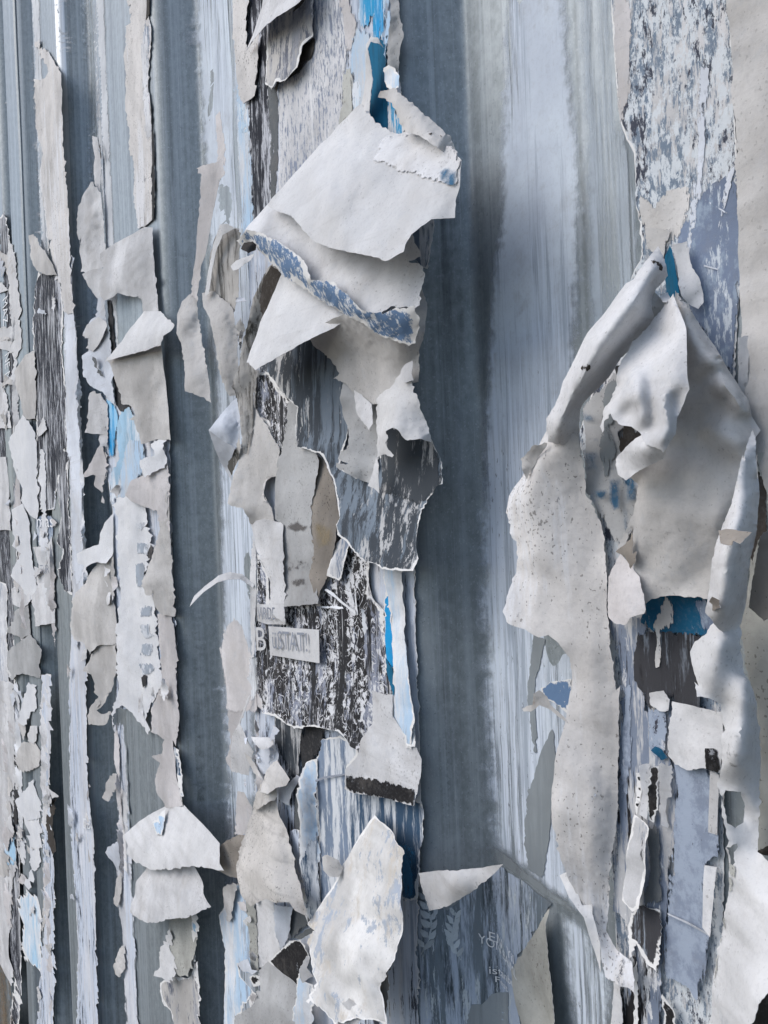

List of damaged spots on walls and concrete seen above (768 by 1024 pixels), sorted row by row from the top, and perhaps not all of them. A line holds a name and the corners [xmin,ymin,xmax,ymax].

peeling [190,572,254,606]
peeling [524,635,556,878]